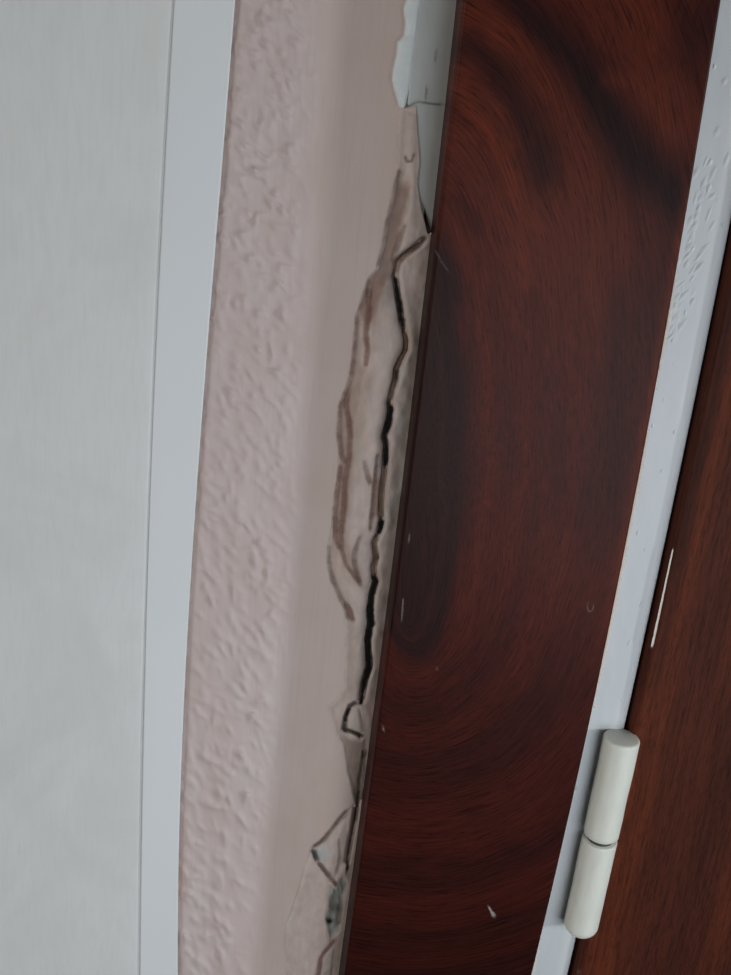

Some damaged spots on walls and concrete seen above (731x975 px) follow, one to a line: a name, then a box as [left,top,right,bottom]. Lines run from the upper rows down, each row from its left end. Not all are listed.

spalling [284,800,362,975]